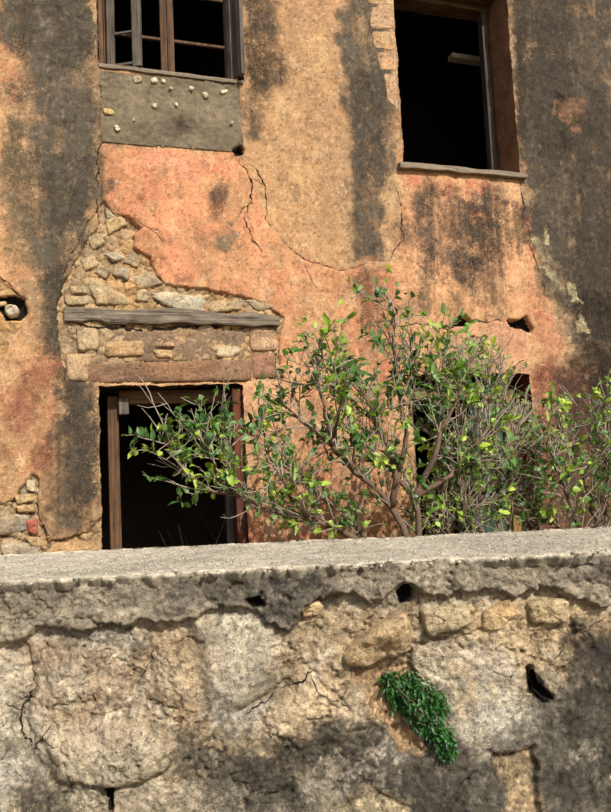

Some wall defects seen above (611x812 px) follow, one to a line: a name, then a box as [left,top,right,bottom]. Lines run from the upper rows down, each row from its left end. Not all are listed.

peeling [0,282,28,368]
water stain [0,0,114,534]
peeling [56,203,283,387]
crack [238,162,405,284]
water stain [335,0,400,352]
water stain [395,0,611,530]
peeling [0,475,102,555]
water stain [541,637,611,805]